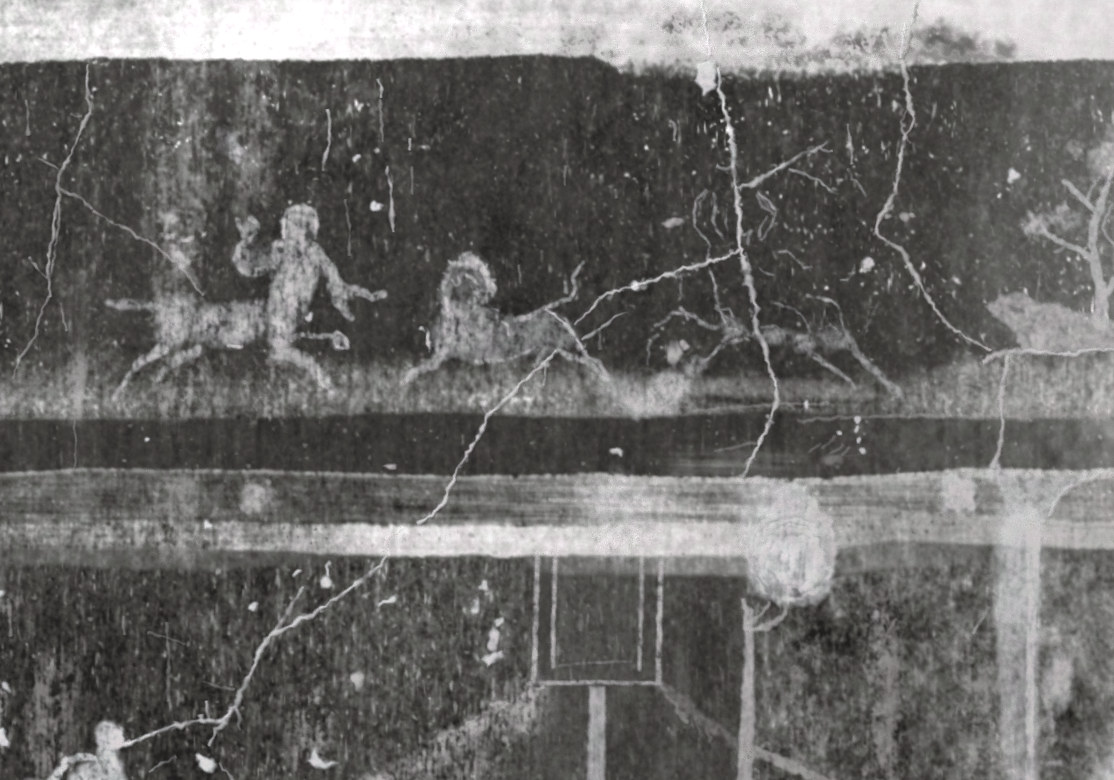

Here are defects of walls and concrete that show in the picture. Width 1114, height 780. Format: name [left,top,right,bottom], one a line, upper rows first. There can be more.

crack [591,14,778,460]
crack [876,7,1114,463]
crack [417,313,574,524]
crack [247,558,385,679]
crack [128,711,231,745]